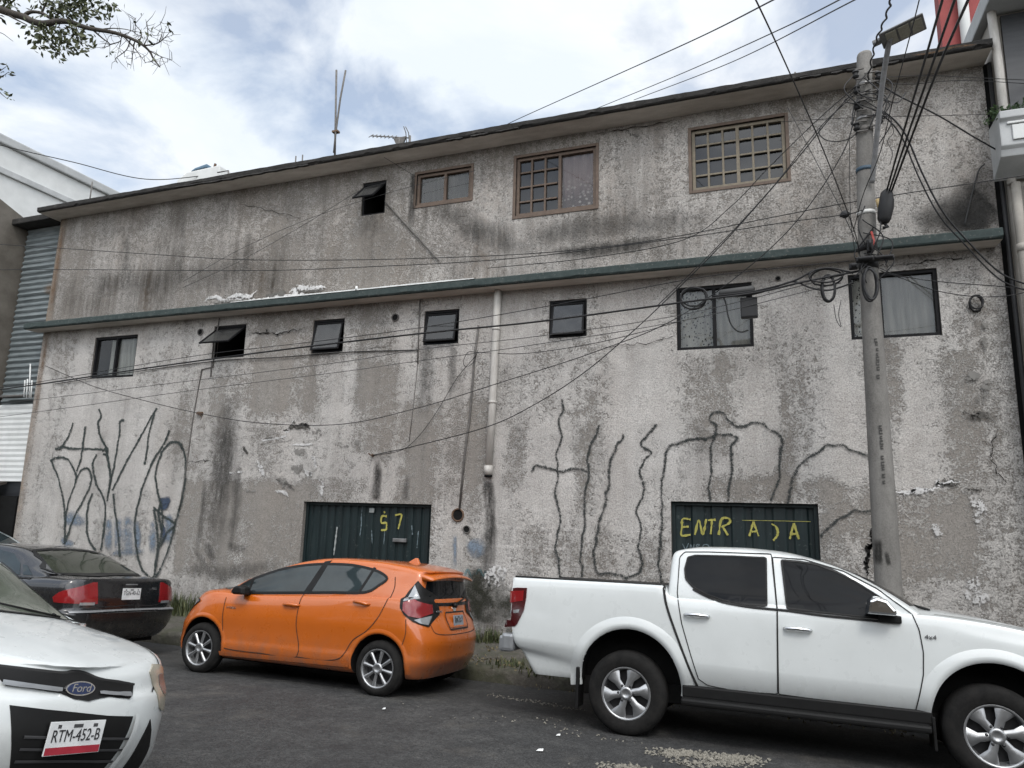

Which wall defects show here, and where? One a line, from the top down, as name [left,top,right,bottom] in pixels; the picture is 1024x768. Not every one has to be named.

damp [928,186,996,229]
damp [565,239,645,254]
peeling [205,284,326,304]
peeling [241,420,327,497]
crack [982,433,1008,484]
peeling [896,478,987,523]
damp [465,483,511,621]
peeling [963,576,990,613]